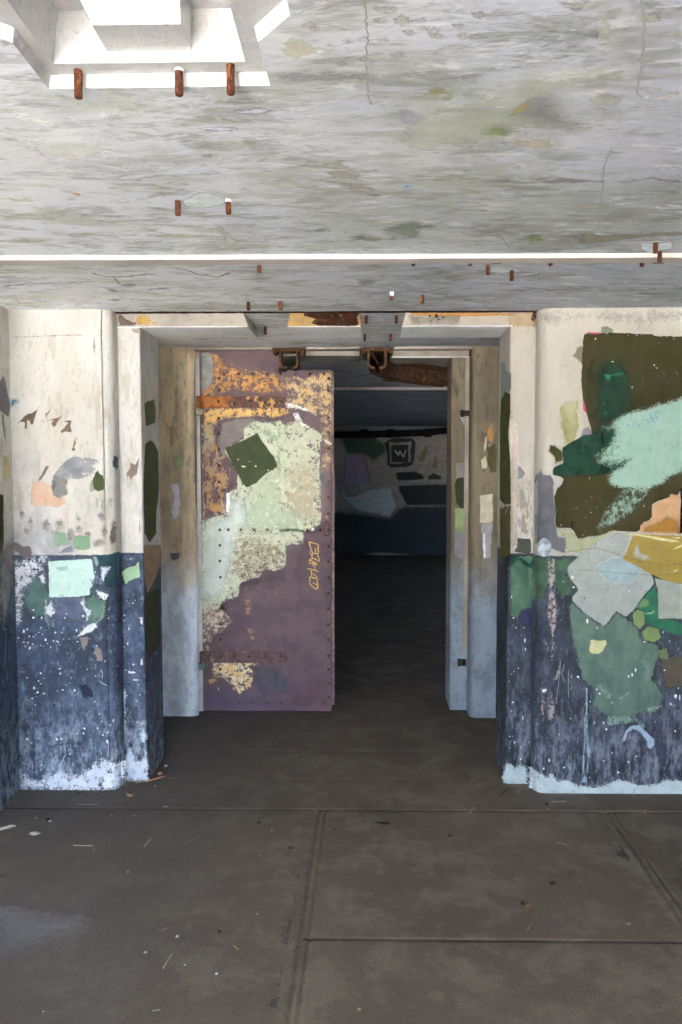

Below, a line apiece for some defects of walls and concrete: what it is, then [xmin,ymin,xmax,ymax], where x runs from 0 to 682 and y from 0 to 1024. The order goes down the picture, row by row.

crack [293,0,372,105]
crack [635,0,649,99]
rust [115,310,537,327]
rust [200,352,333,518]
leakage [20,691,149,790]
leakage [501,688,682,794]